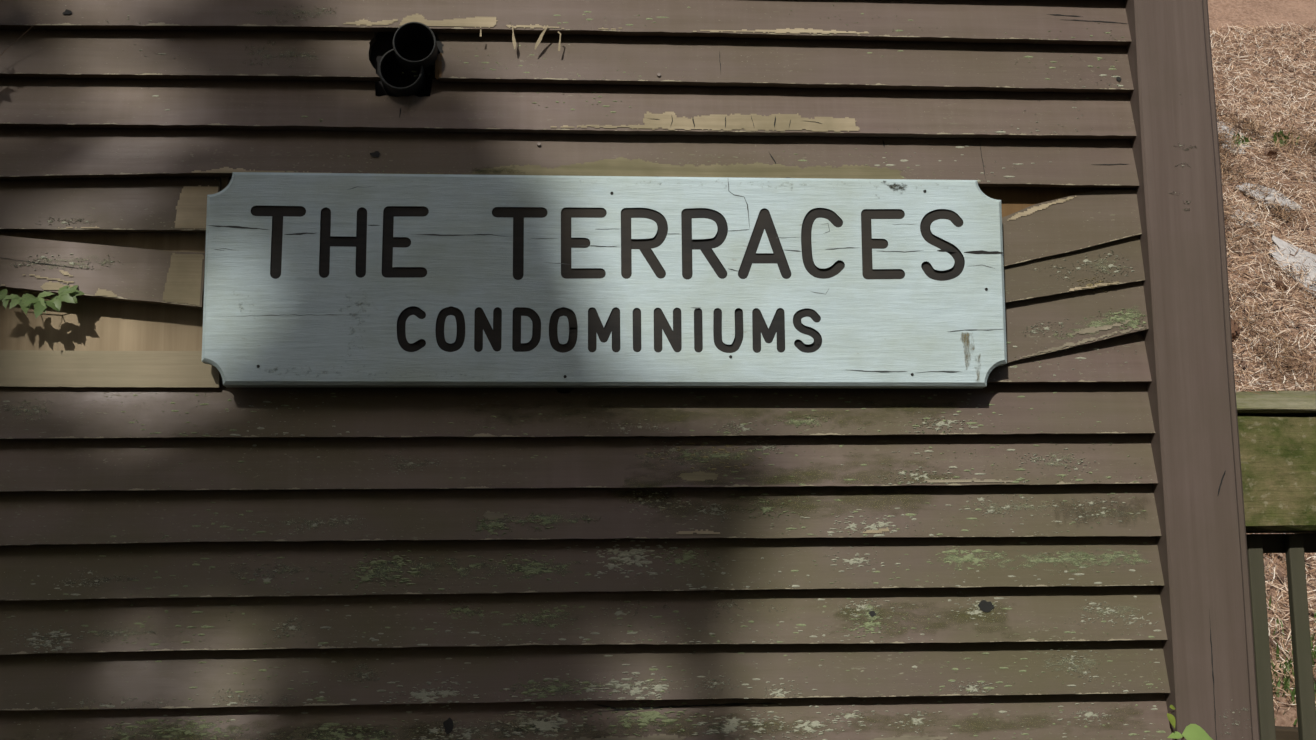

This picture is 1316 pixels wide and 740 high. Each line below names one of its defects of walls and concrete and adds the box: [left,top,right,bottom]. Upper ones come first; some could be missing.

spalling [343,13,564,97]
peeling [551,111,860,132]
peeling [22,270,74,294]
peeling [163,253,204,306]
peeling [95,288,120,302]